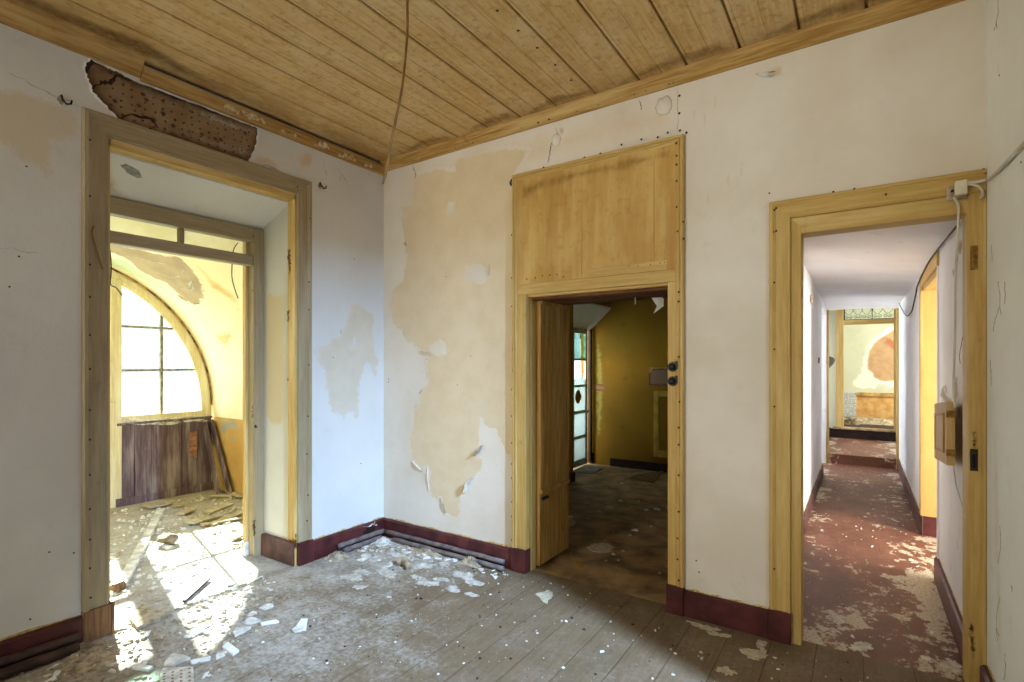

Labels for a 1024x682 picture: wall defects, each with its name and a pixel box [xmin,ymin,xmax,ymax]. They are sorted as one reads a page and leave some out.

flaking render [110,245,208,307]
peeling [314,88,683,521]
flaking render [851,325,894,420]